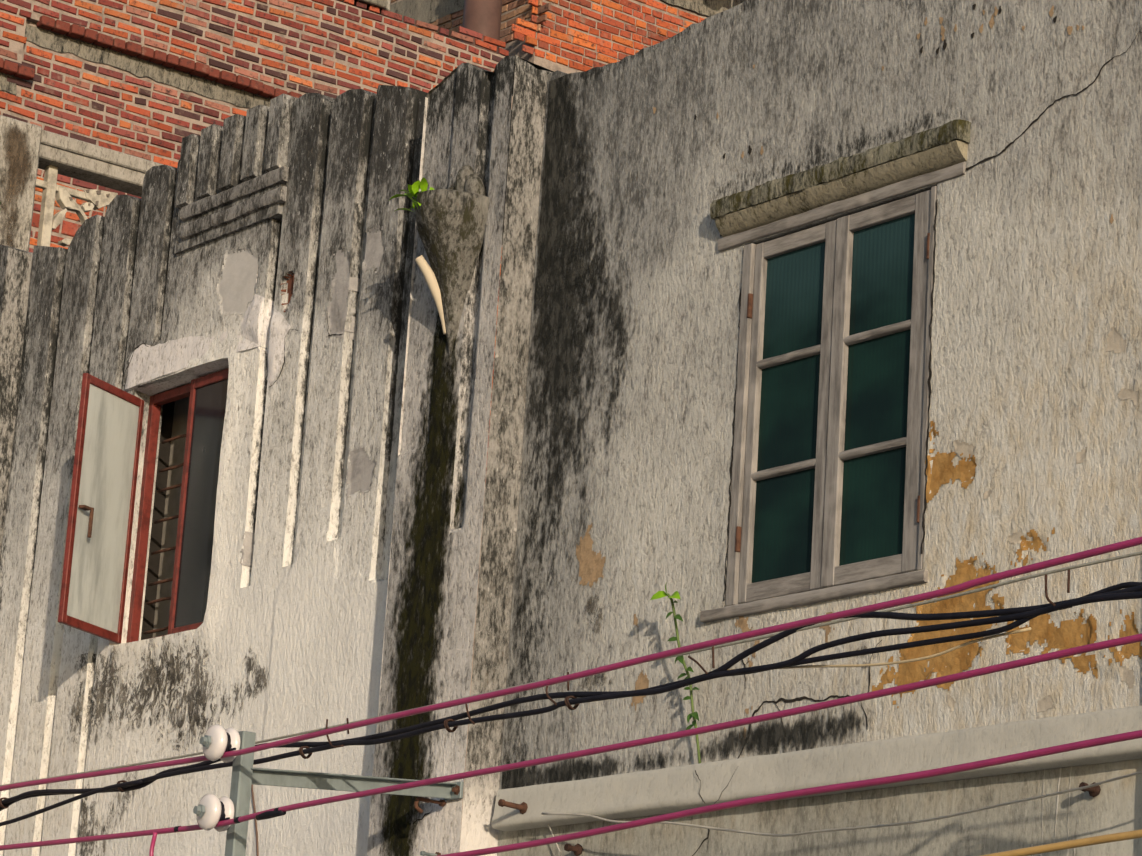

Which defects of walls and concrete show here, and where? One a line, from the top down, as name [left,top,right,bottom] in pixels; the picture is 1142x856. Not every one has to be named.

crack [950,32,1142,171]
water stain [0,126,31,248]
water stain [509,73,630,722]
flaking render [925,421,977,503]
water stain [384,313,468,780]
flaking render [576,523,606,588]
flaking render [1008,527,1055,566]
water stain [70,635,269,748]
water stain [501,710,869,789]
crack [692,640,882,856]
flaking render [872,553,1142,708]
water stain [379,794,428,856]